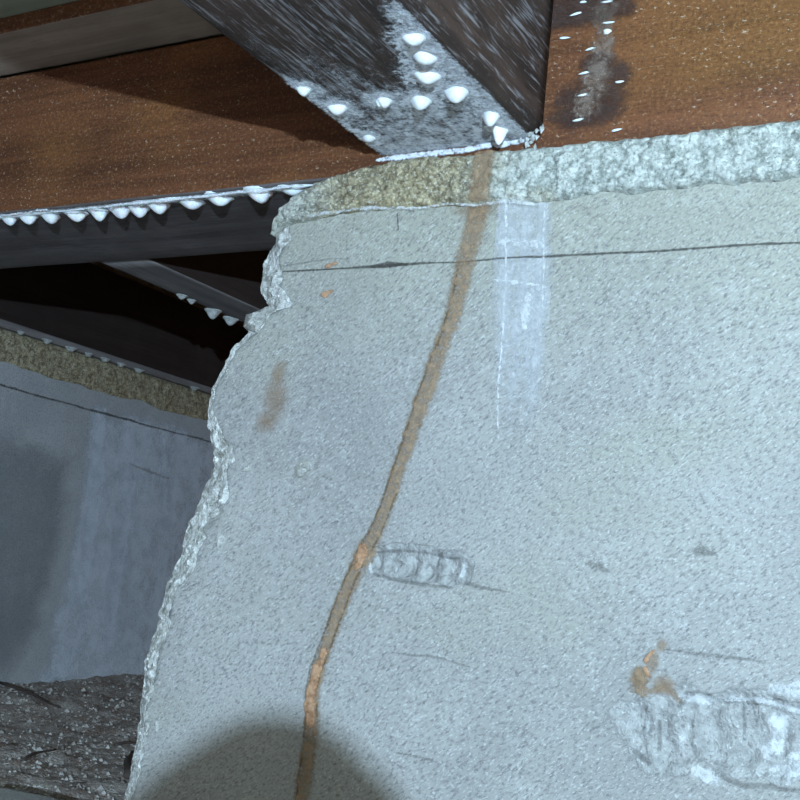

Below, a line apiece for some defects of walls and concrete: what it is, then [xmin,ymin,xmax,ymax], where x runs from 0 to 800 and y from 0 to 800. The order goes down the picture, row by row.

leakage [551,0,637,132]
leakage [497,237,543,329]
crack [283,150,800,800]
spalling [365,542,474,588]
rust [630,644,681,703]
spalling [608,680,800,789]